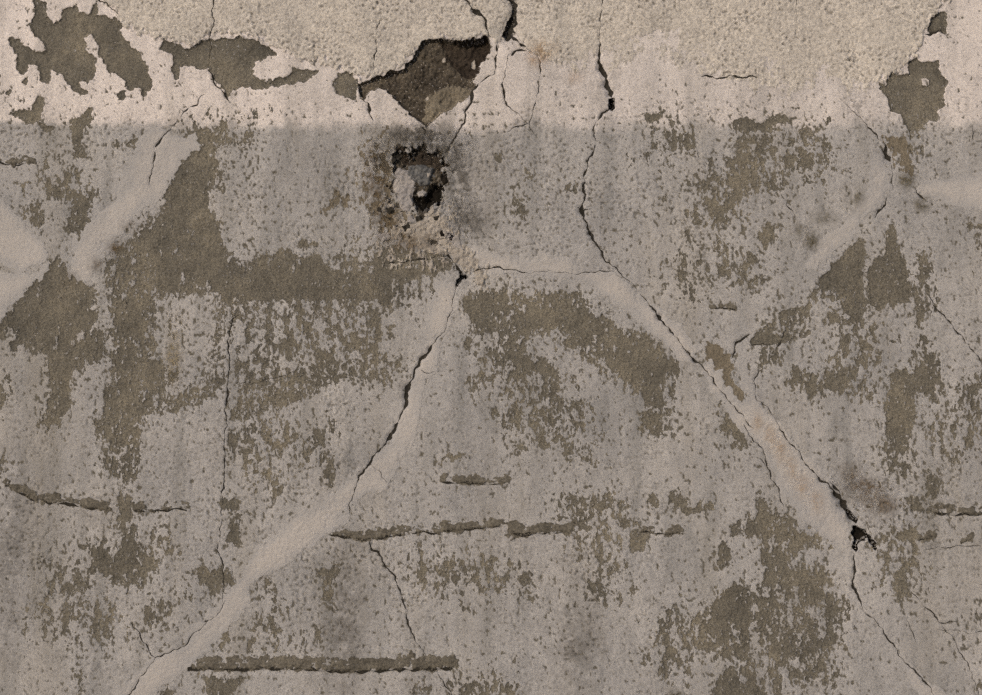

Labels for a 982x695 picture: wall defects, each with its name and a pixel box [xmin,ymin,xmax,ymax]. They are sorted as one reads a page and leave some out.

peeling [8,0,152,100]
peeling [159,35,319,97]
spalling [332,35,493,127]
crack [845,103,925,217]
peeling [879,57,948,177]
crack [348,0,858,523]
peeling [0,89,457,695]
peeling [458,280,690,620]
peeling [750,224,982,604]
crack [369,540,452,695]
peeling [624,486,852,695]
crack [851,556,982,695]